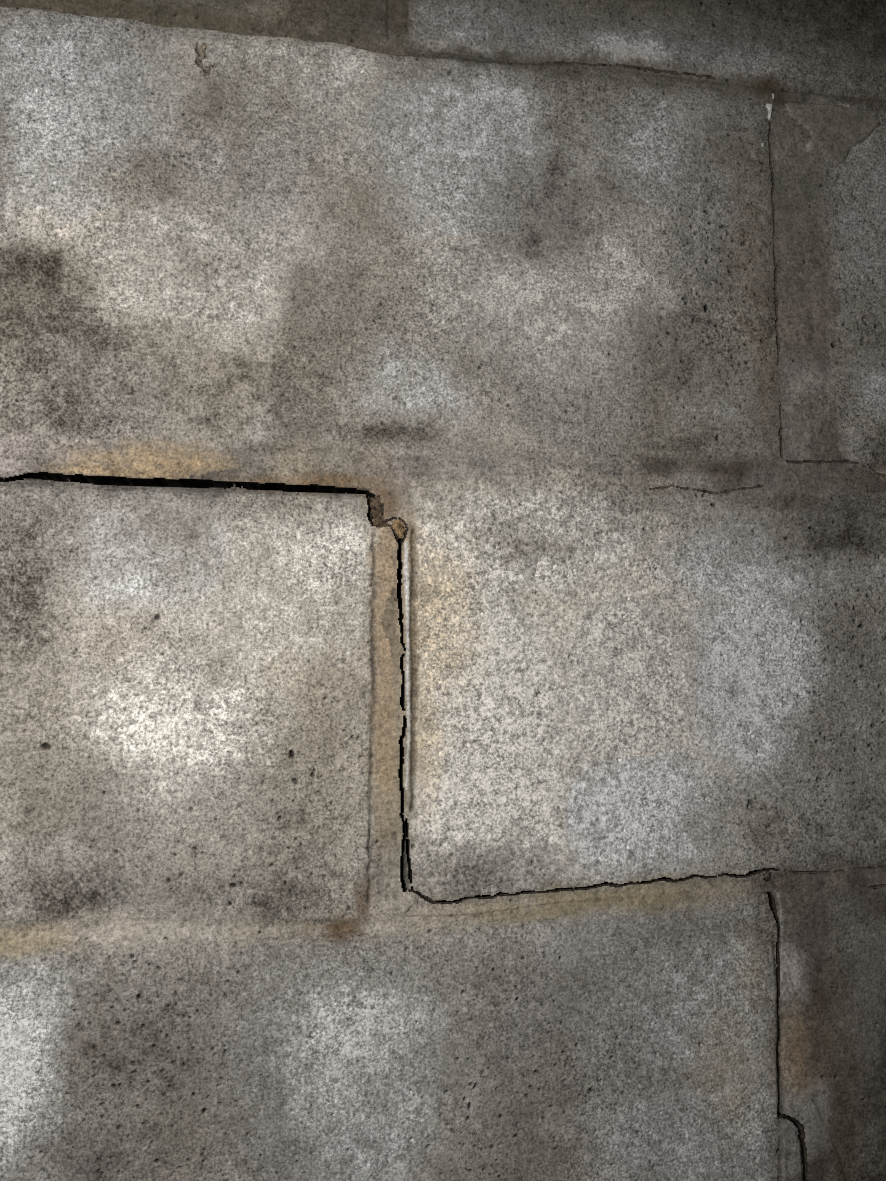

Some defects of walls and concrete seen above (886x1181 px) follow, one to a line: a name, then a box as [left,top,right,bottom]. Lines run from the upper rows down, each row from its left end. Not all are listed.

spalling [194,42,221,76]
crack [768,122,885,478]
crack [0,472,886,1181]